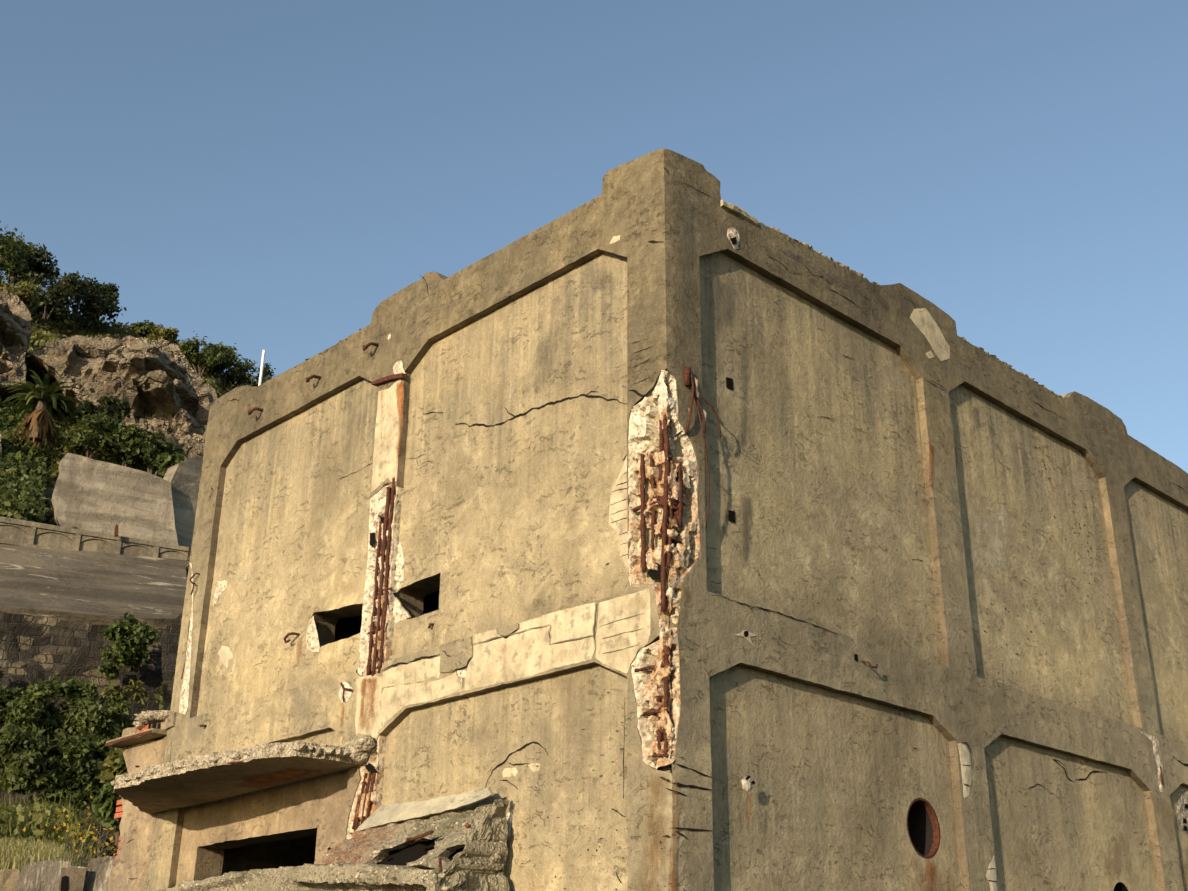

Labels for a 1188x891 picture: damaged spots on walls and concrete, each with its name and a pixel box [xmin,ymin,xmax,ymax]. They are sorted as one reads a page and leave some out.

crack [426,339,661,427]
spalling [339,361,701,843]
crack [485,741,548,788]
spalling [377,830,464,882]
corrosion [669,780,677,891]